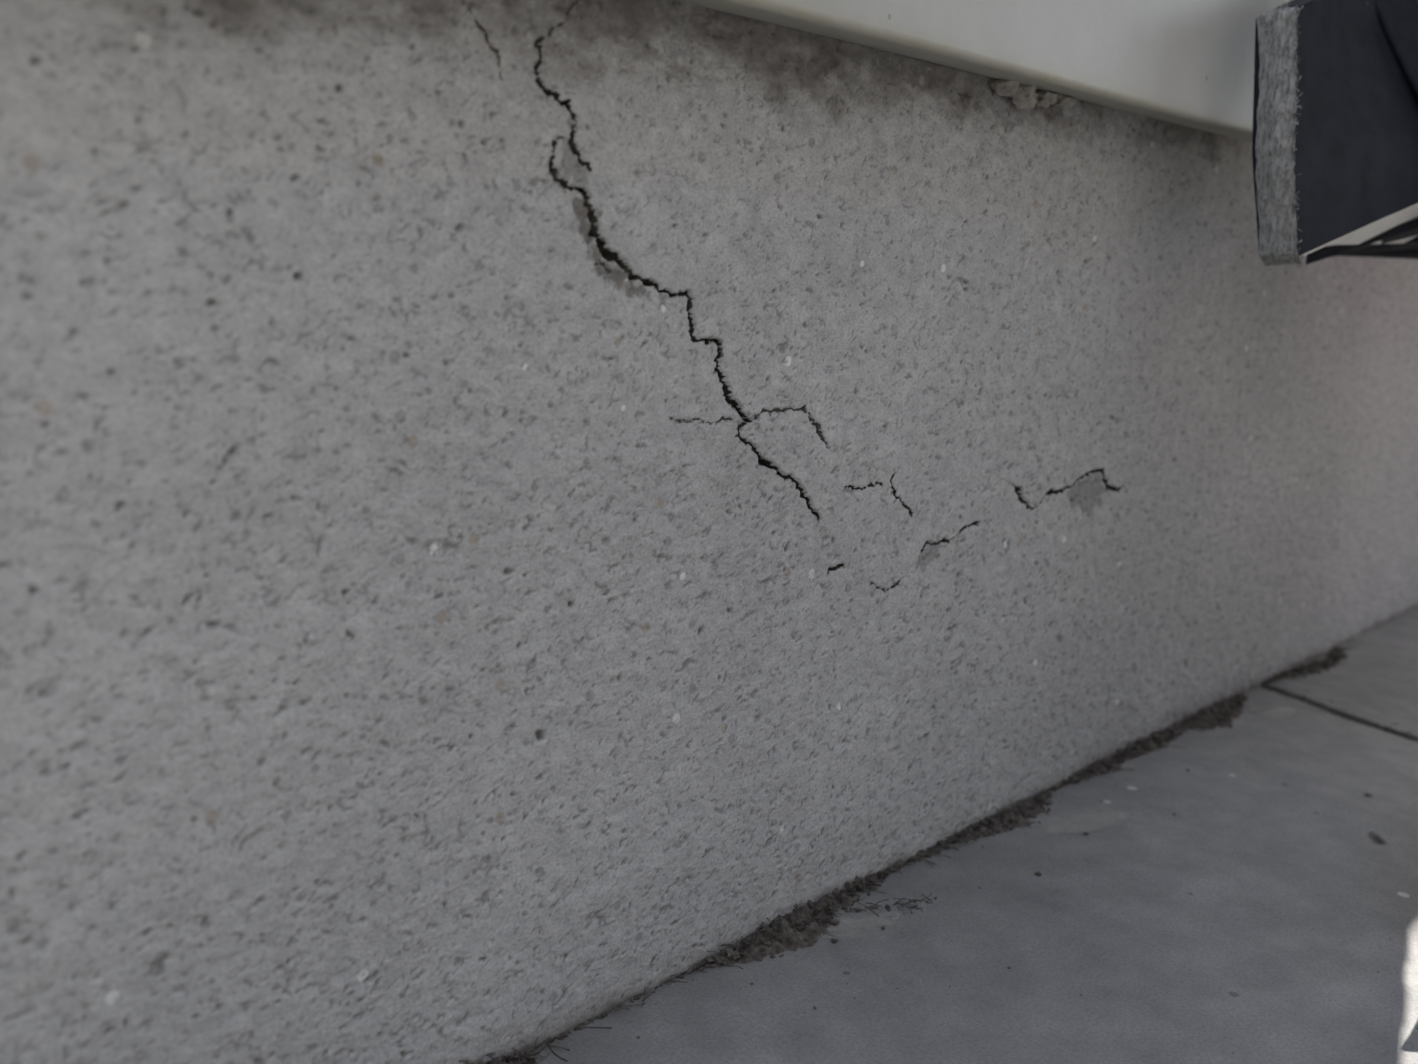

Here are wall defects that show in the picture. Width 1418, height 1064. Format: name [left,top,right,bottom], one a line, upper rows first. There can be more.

crack [462,0,827,522]
crack [844,472,979,552]
crack [1014,468,1122,510]
crack [828,564,900,592]